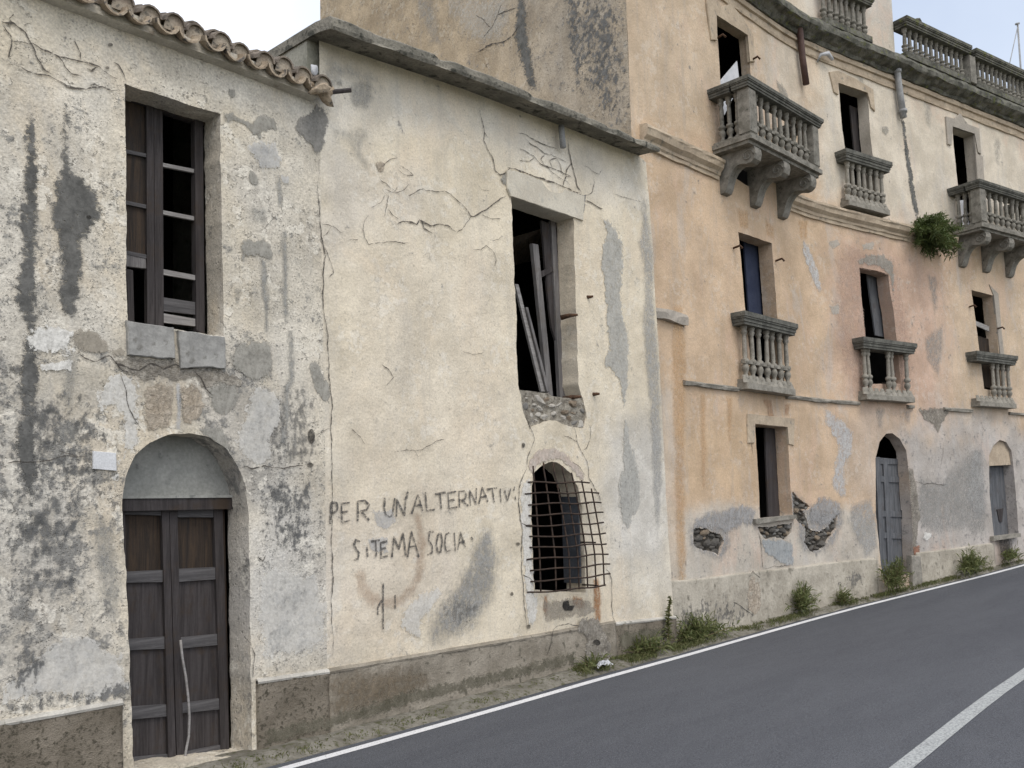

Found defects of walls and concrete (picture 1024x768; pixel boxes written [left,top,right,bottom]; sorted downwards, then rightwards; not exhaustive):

crack [3,14,126,91]
water stain [513,0,537,91]
water stain [901,119,919,218]
water stain [0,103,110,598]
crack [76,352,212,428]
crack [317,114,637,644]
spalling [519,390,585,428]
water stain [401,533,495,640]
water stain [15,630,45,691]